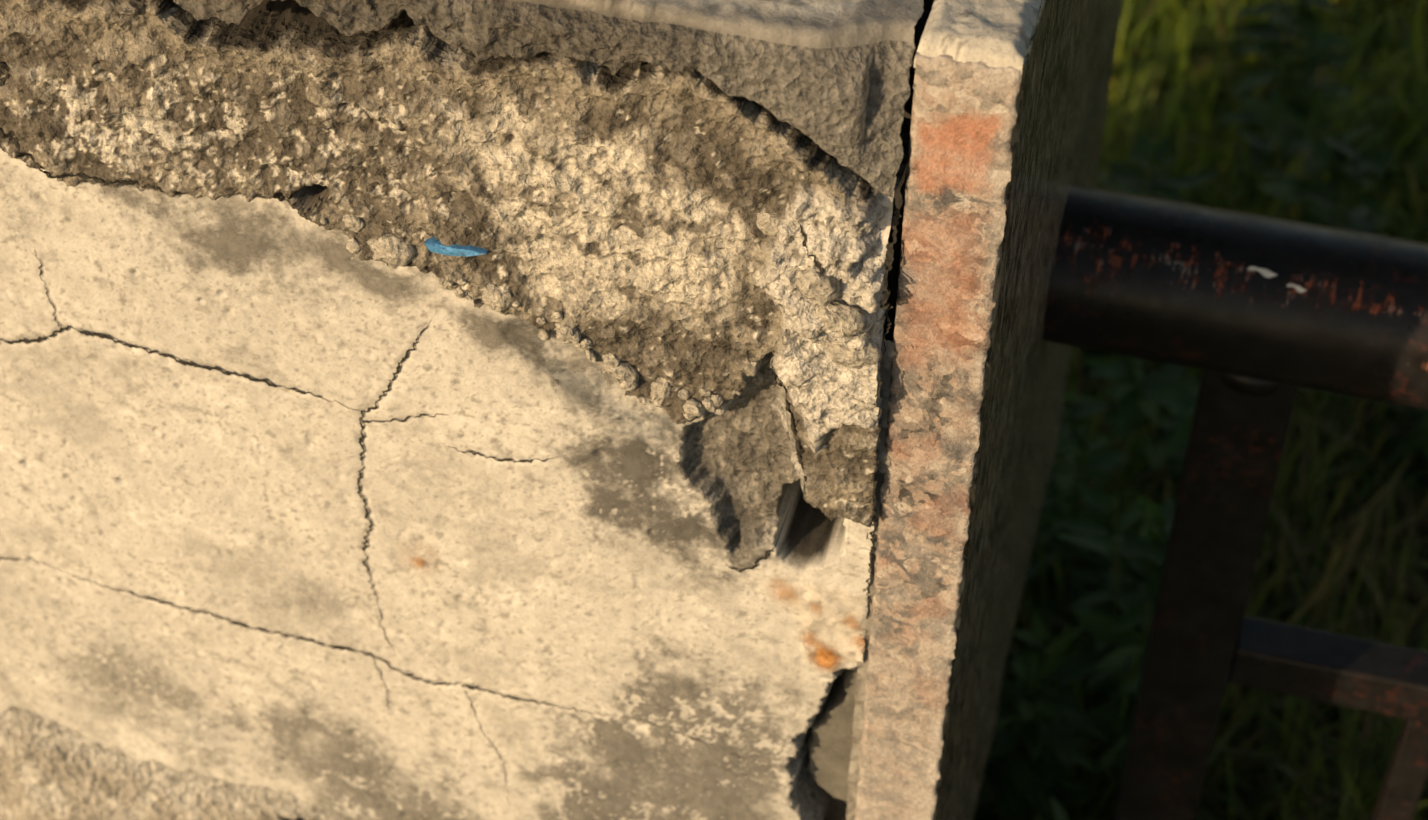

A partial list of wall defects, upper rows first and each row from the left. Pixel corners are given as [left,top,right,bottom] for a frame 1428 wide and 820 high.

spalling [0,0,889,564]
crack [799,223,824,274]
rust [1054,217,1427,318]
crack [0,252,766,807]
crack [727,359,807,572]
crack [861,164,908,663]
rust [806,635,840,671]